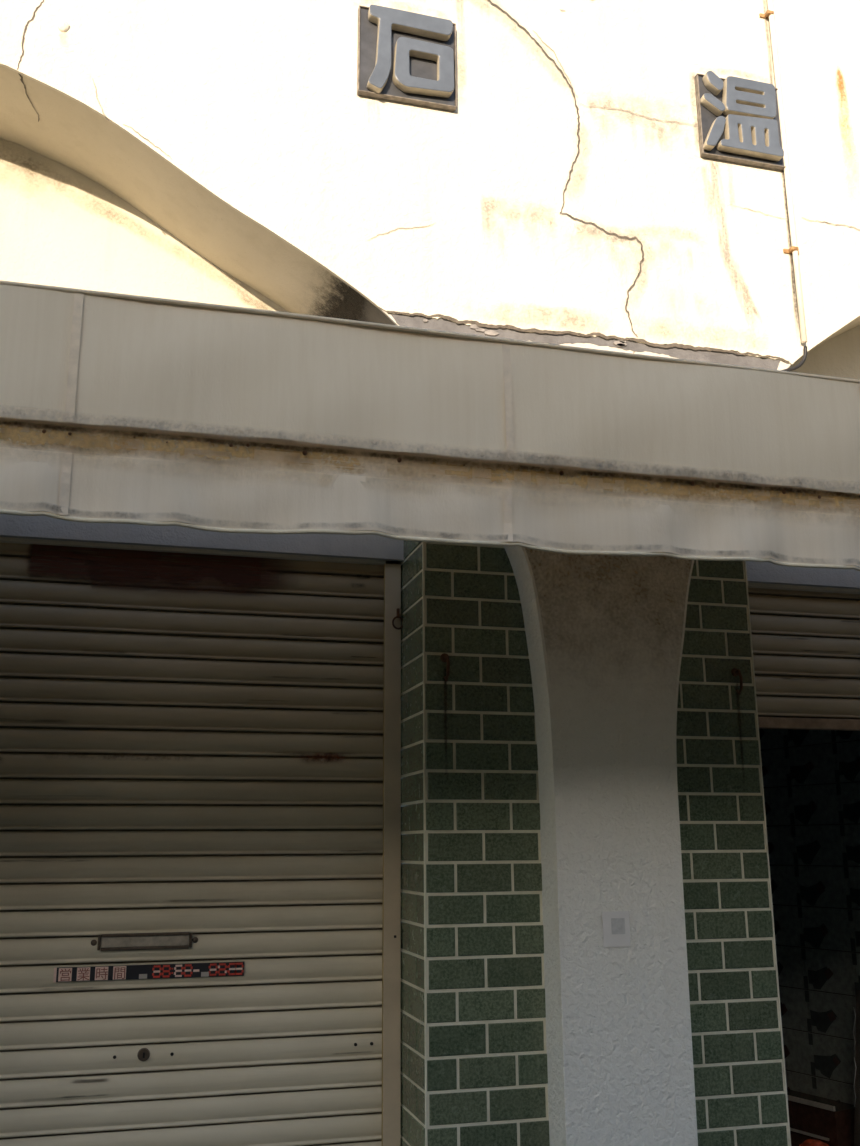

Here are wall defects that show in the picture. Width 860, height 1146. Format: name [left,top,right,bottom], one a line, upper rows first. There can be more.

crack [17,0,44,122]
crack [387,0,790,362]
crack [730,204,860,230]
water stain [319,279,395,325]